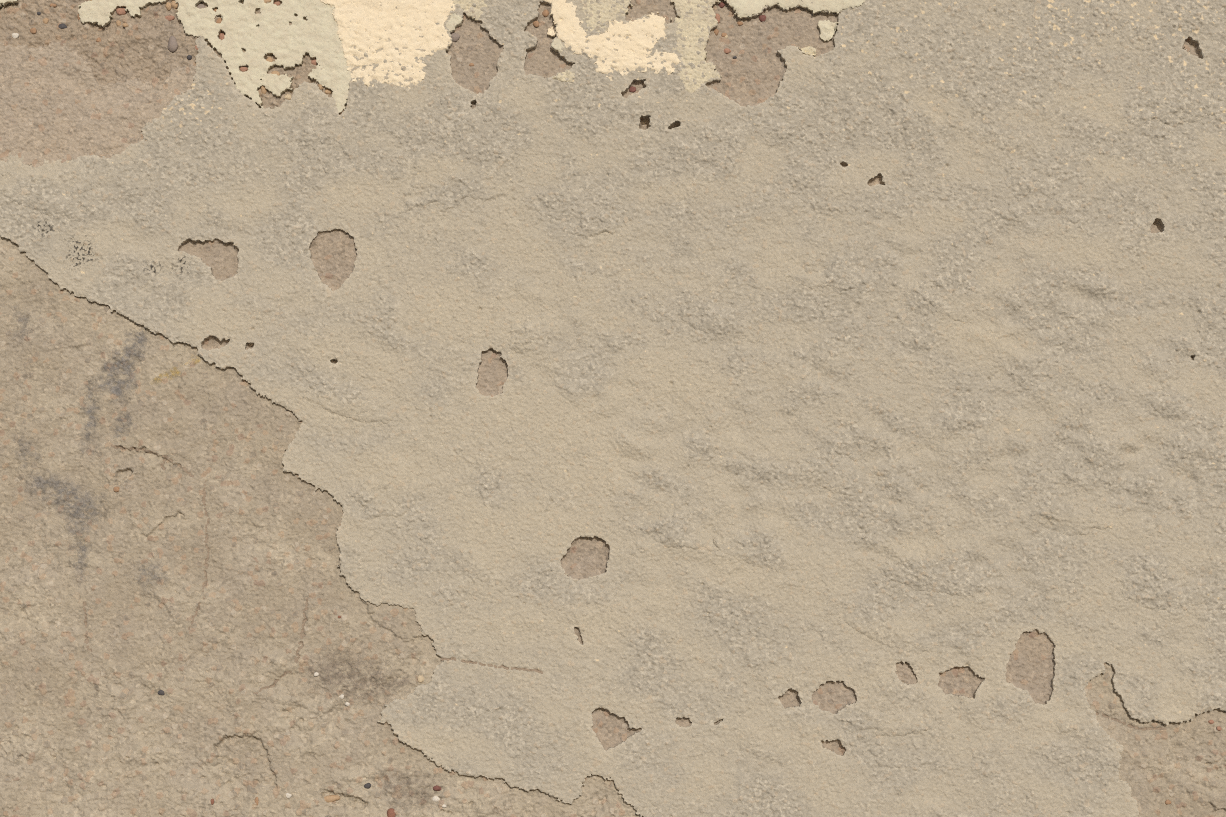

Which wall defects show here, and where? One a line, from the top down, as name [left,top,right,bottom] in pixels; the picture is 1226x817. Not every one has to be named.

spalling [524,0,865,107]
spalling [0,0,503,168]
spalling [639,117,650,130]
spalling [867,174,884,186]
spalling [1150,219,1162,233]
spalling [0,229,644,817]
spalling [778,681,856,714]
spalling [895,661,917,685]
spalling [938,666,985,698]
spalling [1005,629,1055,704]
spalling [821,739,846,756]
spalling [1085,662,1226,817]